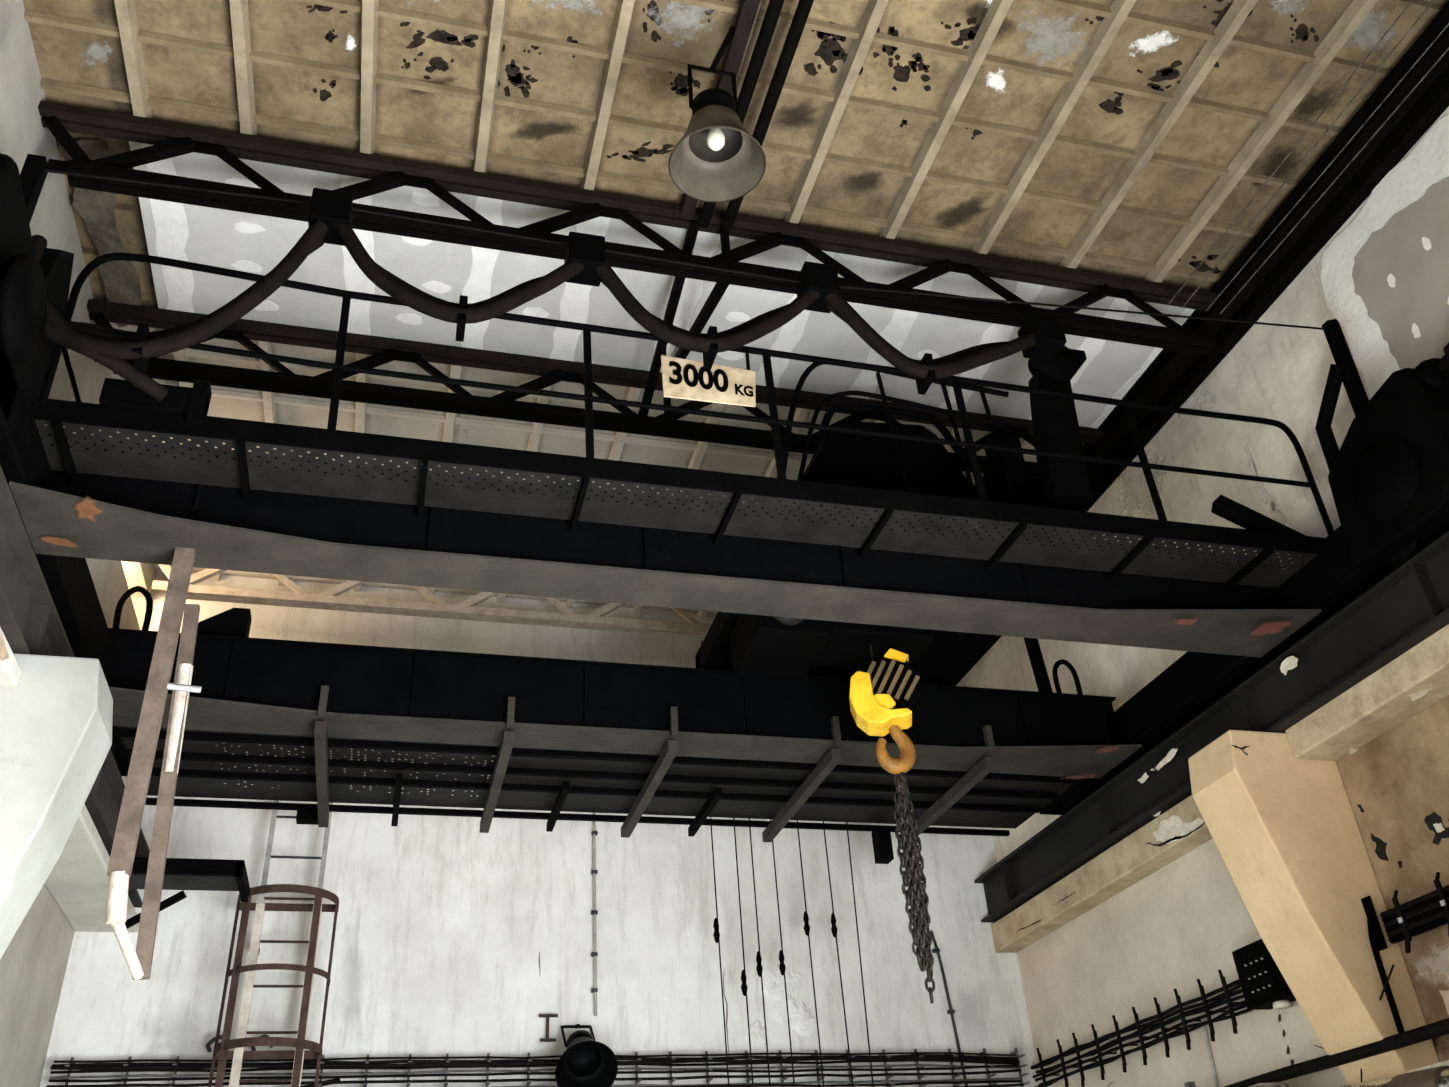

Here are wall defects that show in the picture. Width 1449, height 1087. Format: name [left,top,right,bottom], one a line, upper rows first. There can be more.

peeling [642,0,669,42]
peeling [497,45,542,98]
peeling [803,22,931,91]
spalling [1147,811,1205,847]
peeling [1424,812,1449,845]
peeling [1371,833,1403,869]